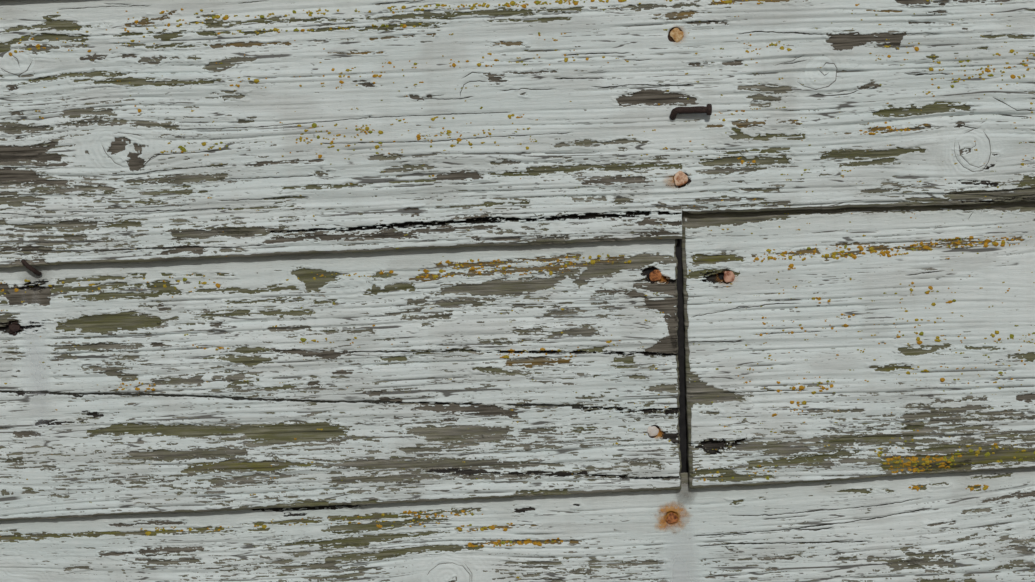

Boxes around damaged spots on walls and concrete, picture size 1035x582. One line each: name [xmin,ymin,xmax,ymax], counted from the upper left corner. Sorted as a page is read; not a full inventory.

peeling [0,0,790,101]
peeling [825,0,1010,51]
peeling [0,108,228,205]
peeling [368,138,1035,237]
peeling [699,84,806,175]
peeling [0,272,354,390]
peeling [145,200,757,415]
crack [0,370,401,404]
crack [508,402,588,410]
peeling [0,391,611,580]
rust [659,506,684,528]
peeling [690,393,1035,526]